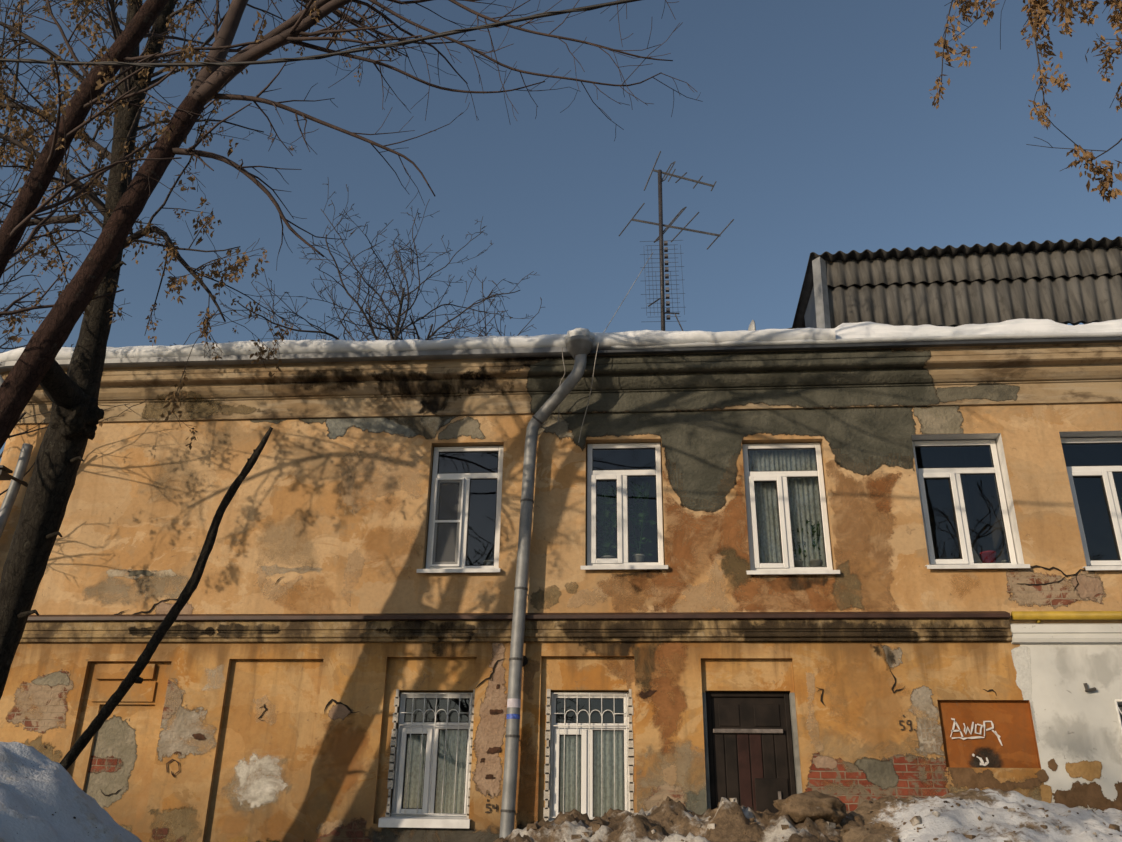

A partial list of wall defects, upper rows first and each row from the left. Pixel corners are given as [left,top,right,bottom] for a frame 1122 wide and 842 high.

leakage [142,391,261,420]
flaking render [250,416,485,512]
leakage [294,357,553,414]
flaking render [526,348,1020,512]
peeling [85,569,189,603]
flaking render [1006,568,1106,609]
flaking render [6,669,73,762]
flaking render [84,715,137,810]
flaking render [156,679,217,761]
peeling [223,754,290,811]
flaking render [472,643,508,798]
flaking render [803,686,1122,814]